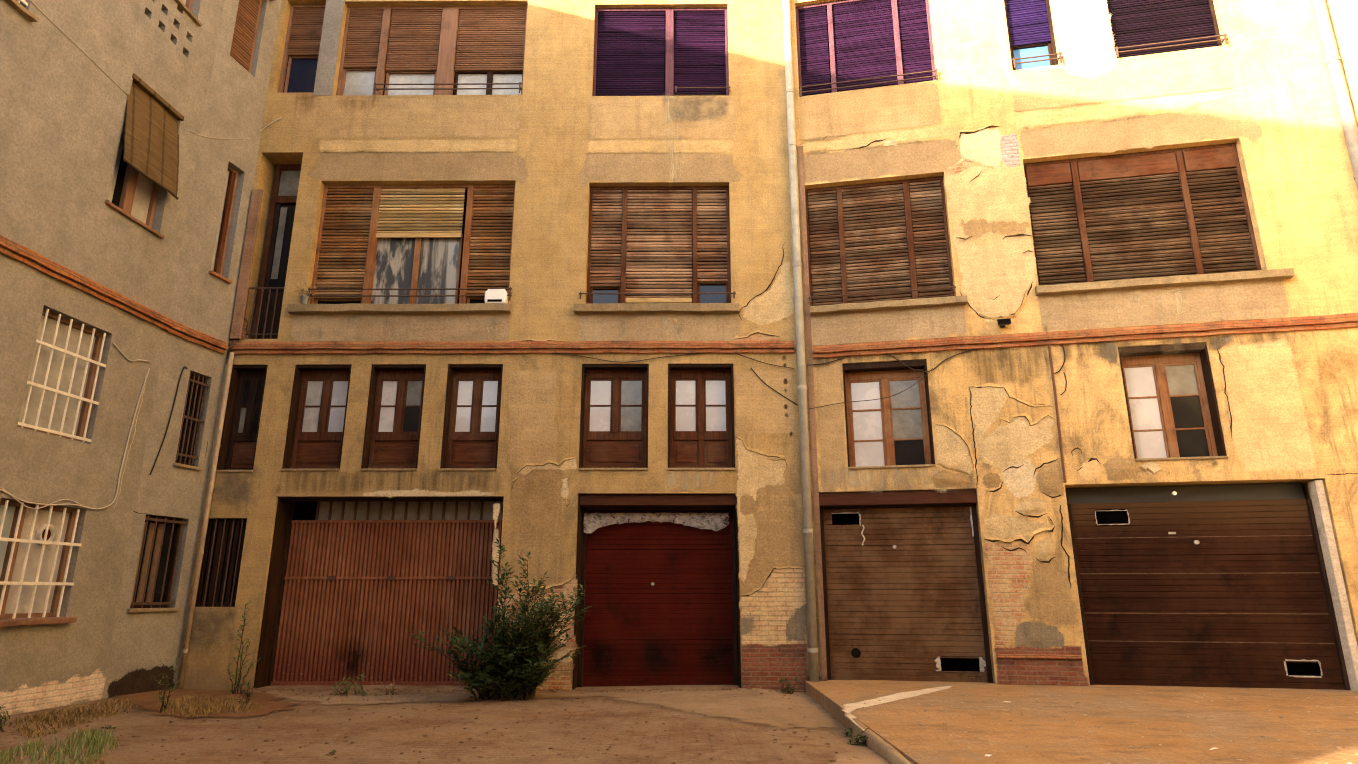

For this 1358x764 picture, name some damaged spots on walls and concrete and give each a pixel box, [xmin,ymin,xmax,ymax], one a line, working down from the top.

peeling [1050,0,1117,80]
peeling [944,124,1037,322]
peeling [733,261,795,416]
peeling [934,382,1056,498]
flaking render [736,435,808,693]
flaking render [983,513,1089,686]